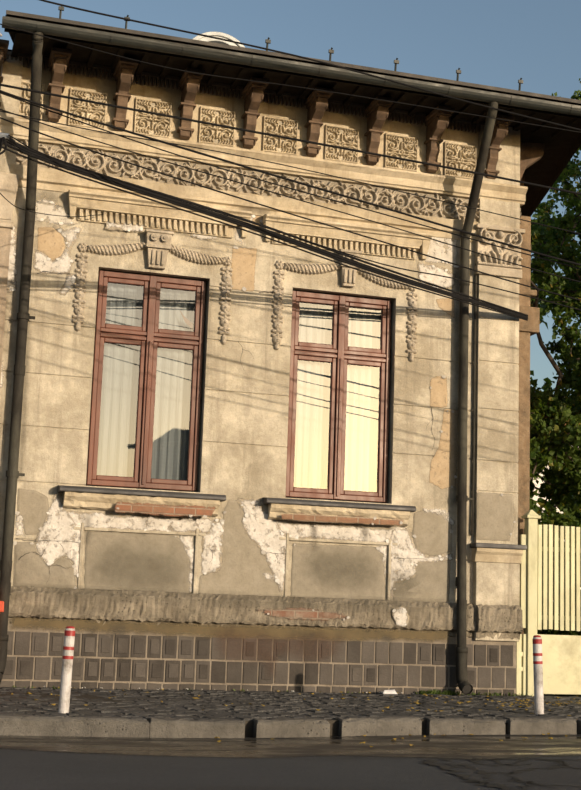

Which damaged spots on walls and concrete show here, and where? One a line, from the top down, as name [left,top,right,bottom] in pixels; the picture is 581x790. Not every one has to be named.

peeling [7,226,18,293]
peeling [34,200,81,295]
peeling [417,237,459,289]
peeling [436,298,455,318]
peeling [15,511,23,535]
peeling [35,492,225,592]
peeling [237,499,454,596]